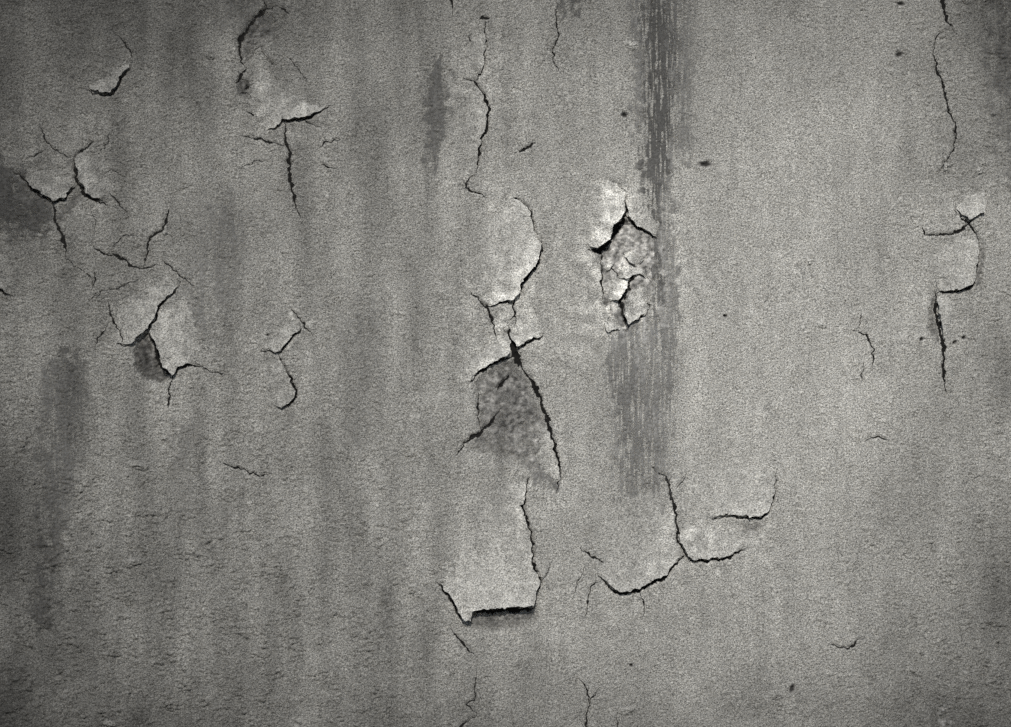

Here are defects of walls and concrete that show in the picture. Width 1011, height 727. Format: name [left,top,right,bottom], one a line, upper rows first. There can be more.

peeling [82,34,133,96]
peeling [236,1,330,217]
crack [552,8,561,73]
crack [933,0,957,173]
peeling [14,127,223,408]
peeling [588,180,666,334]
leakage [606,0,693,492]
peeling [919,187,987,391]
peeling [437,197,561,627]
peeling [580,460,777,617]
crack [451,629,477,727]
crack [579,679,600,727]